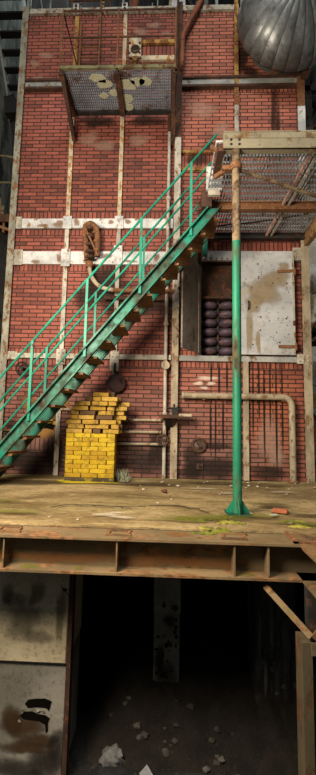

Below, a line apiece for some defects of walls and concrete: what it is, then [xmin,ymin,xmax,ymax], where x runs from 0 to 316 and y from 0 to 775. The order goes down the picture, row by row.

corrosion [0,552,108,563]
corrosion [125,556,229,568]
leakage [0,732,62,775]